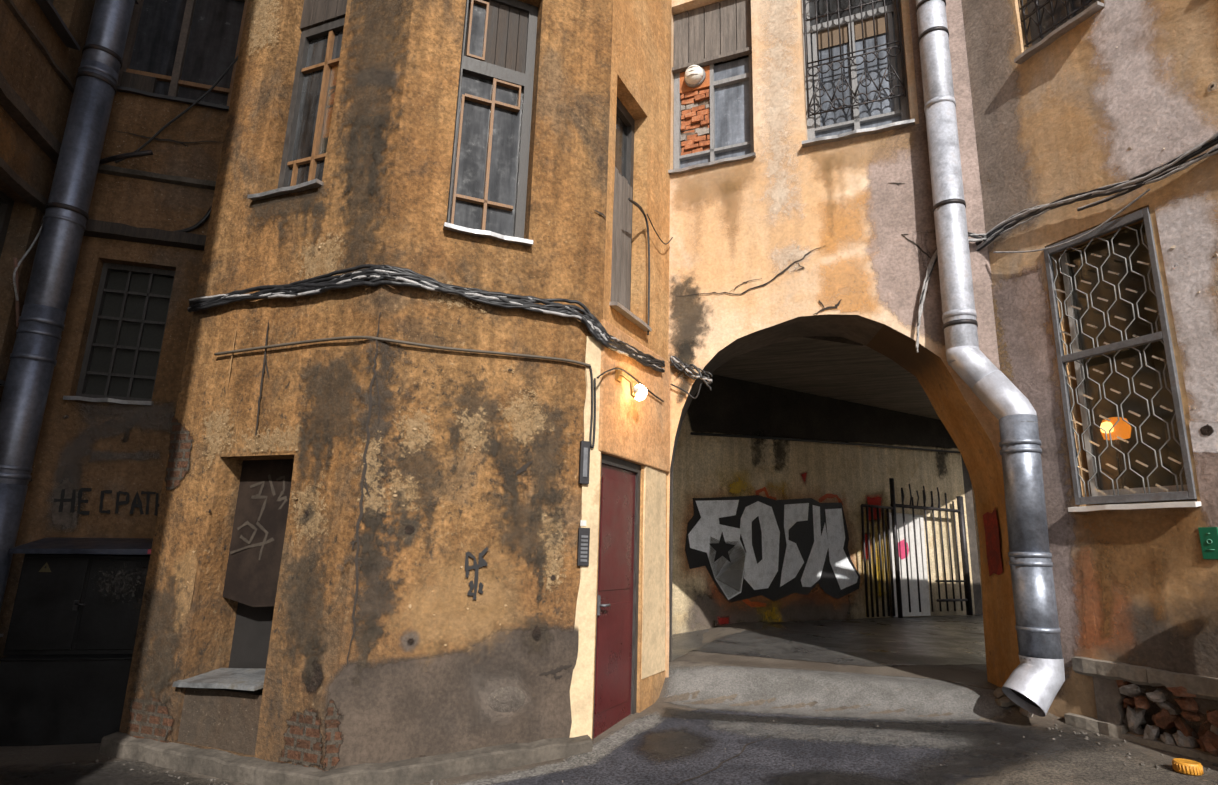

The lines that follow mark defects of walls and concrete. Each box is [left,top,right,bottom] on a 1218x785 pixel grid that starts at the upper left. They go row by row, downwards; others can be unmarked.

crack [680,245,826,297]
crack [813,299,842,315]
flaking render [1155,198,1218,422]
flaking render [165,405,301,491]
leakage [450,427,460,473]
leakage [362,492,408,569]
leakage [425,501,437,548]
leakage [529,489,563,601]
spalling [305,659,324,692]
flaking render [278,700,344,771]